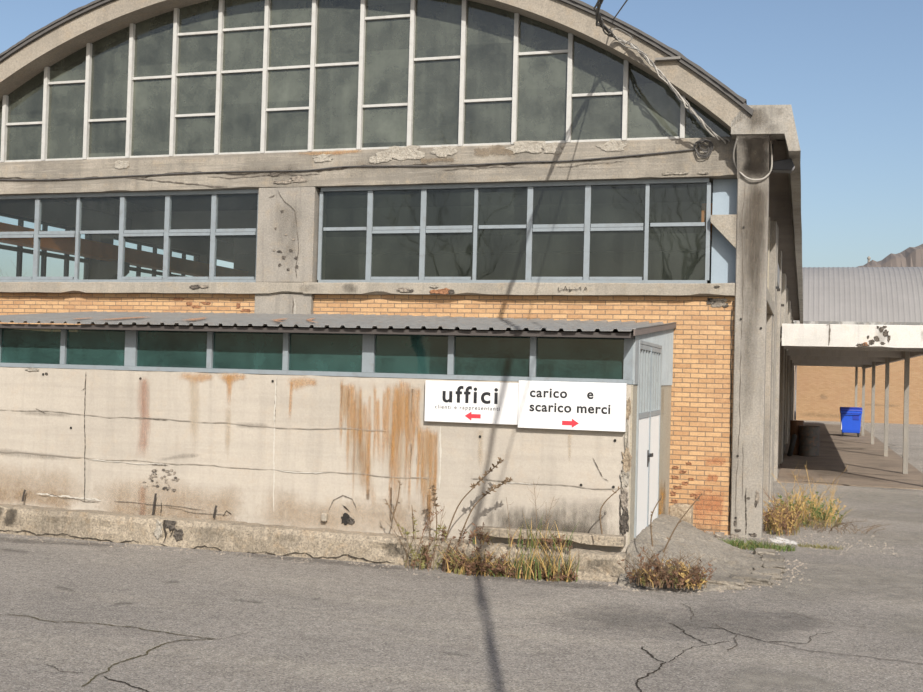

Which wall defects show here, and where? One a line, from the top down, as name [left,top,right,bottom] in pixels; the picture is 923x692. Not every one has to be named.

peeling [369,145,458,164]
peeling [475,141,565,156]
peeling [596,140,627,152]
peeling [857,326,891,347]
corrosion [340,383,436,488]
spalling [341,513,355,525]
crack [0,614,248,692]
crack [635,604,922,692]